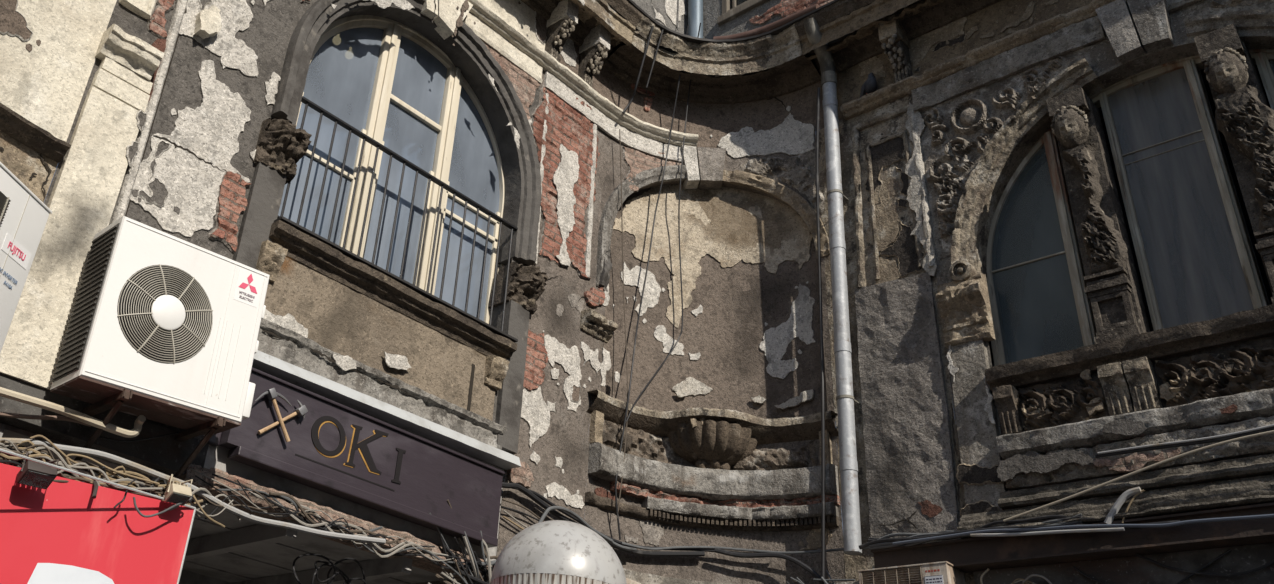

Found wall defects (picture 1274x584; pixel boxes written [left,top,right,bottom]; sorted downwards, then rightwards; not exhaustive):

spalling [0,0,41,52]
flaking render [363,0,415,10]
spalling [452,0,476,46]
spalling [534,11,547,44]
flaking render [560,38,577,67]
flaking render [652,0,687,28]
flaking render [126,0,281,253]
flaking render [484,43,815,379]
flaking render [860,102,937,285]
flaking render [507,329,620,509]